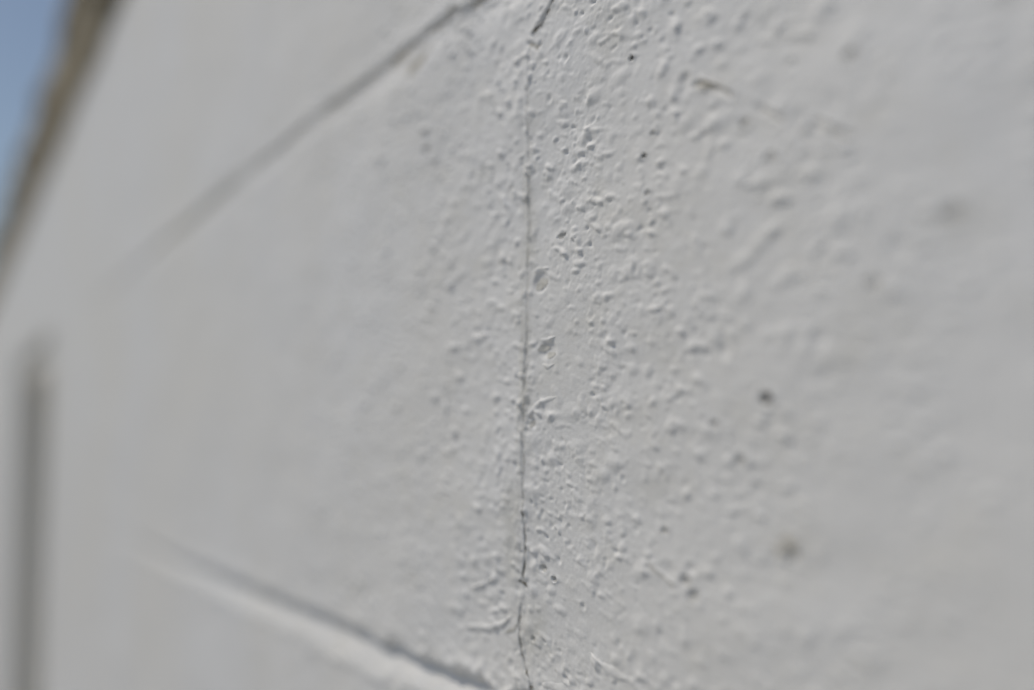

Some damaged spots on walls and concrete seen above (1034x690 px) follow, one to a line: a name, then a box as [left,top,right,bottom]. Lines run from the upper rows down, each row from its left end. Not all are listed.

crack [505,0,554,689]